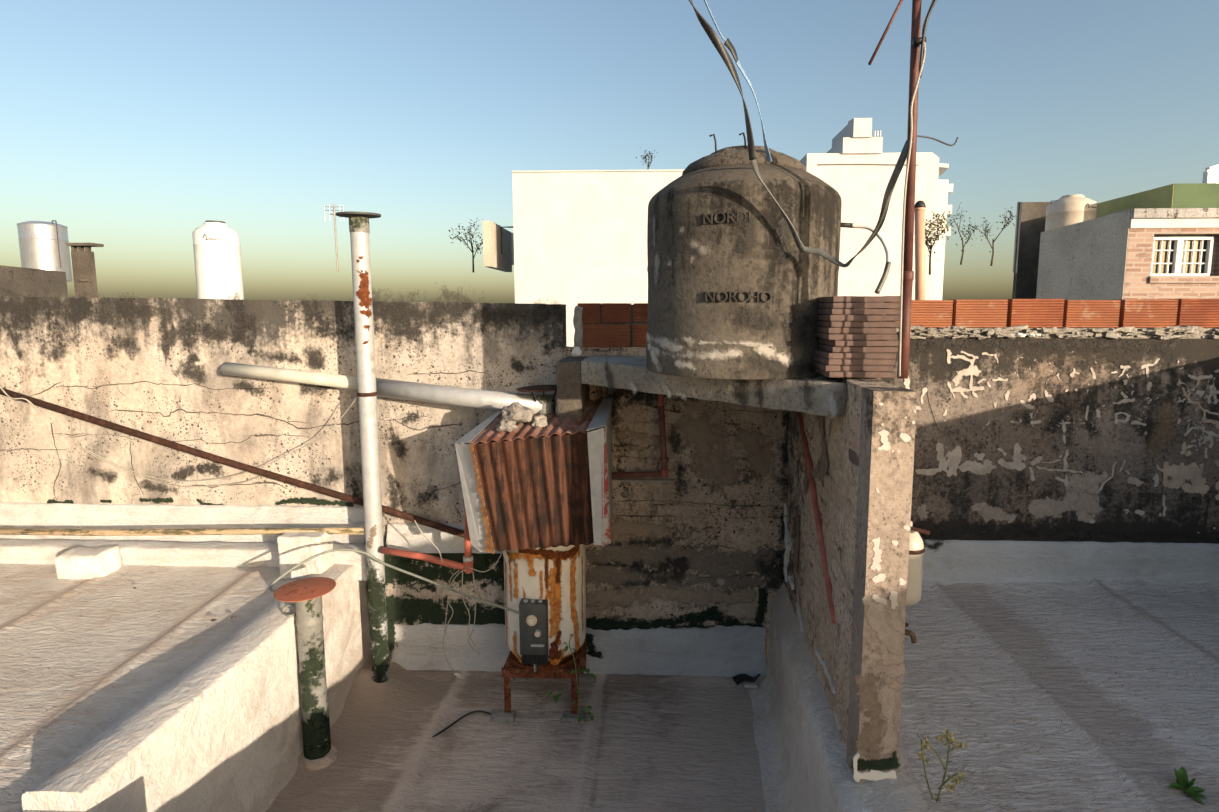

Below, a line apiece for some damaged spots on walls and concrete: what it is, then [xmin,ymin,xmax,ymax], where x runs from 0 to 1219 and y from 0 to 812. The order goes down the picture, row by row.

damp [0,291,352,385]
corrosion [356,256,372,344]
damp [86,468,117,483]
damp [141,462,224,494]
crack [0,381,460,498]
damp [234,380,264,396]
damp [300,384,333,395]
damp [385,412,419,457]
damp [597,306,837,496]
peeling [878,377,928,452]
flaking render [915,349,1219,523]
peeling [870,503,932,609]